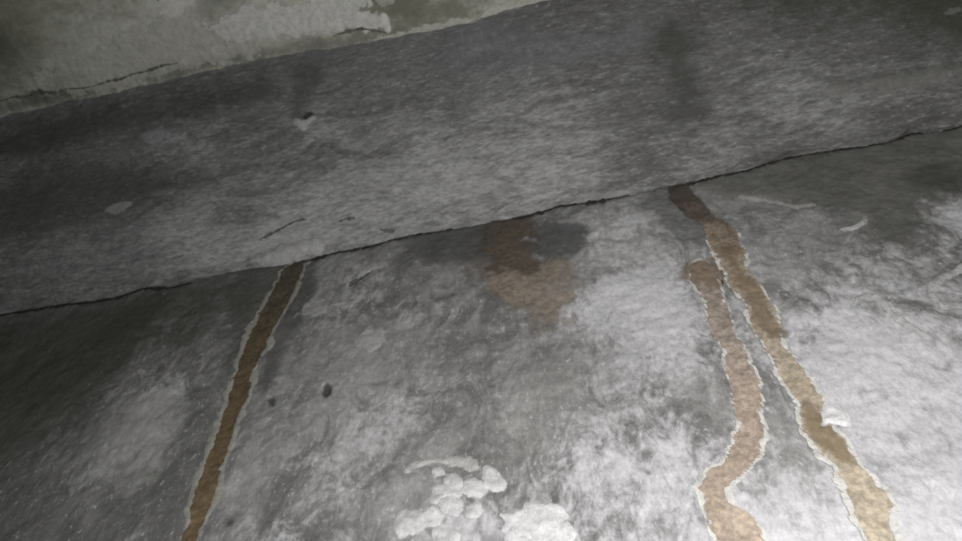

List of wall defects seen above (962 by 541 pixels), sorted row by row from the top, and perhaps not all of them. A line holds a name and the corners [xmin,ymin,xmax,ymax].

rust [479,214,575,323]